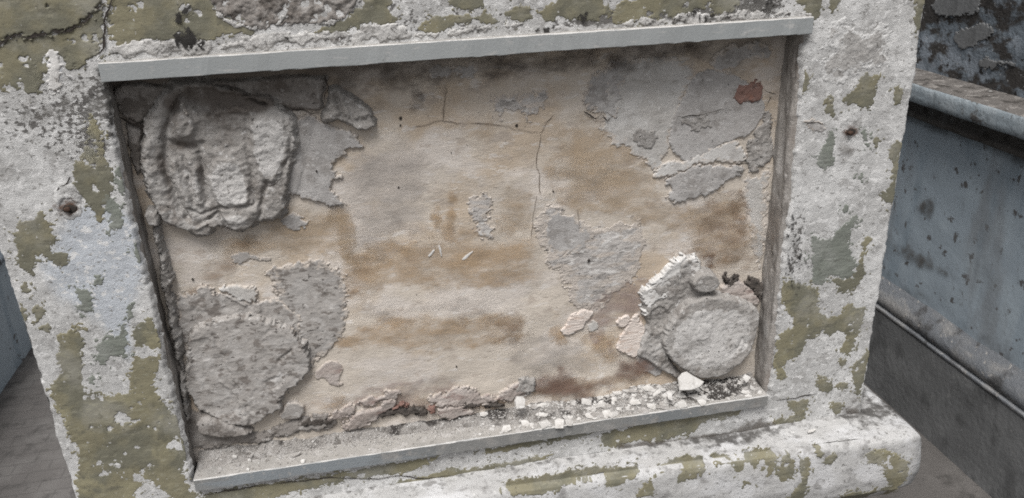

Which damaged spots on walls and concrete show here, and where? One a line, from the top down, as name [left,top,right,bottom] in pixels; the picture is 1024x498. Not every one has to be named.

spalling [320,84,378,130]
crack [410,89,552,235]
flaking render [733,79,763,104]
peeling [3,113,838,498]